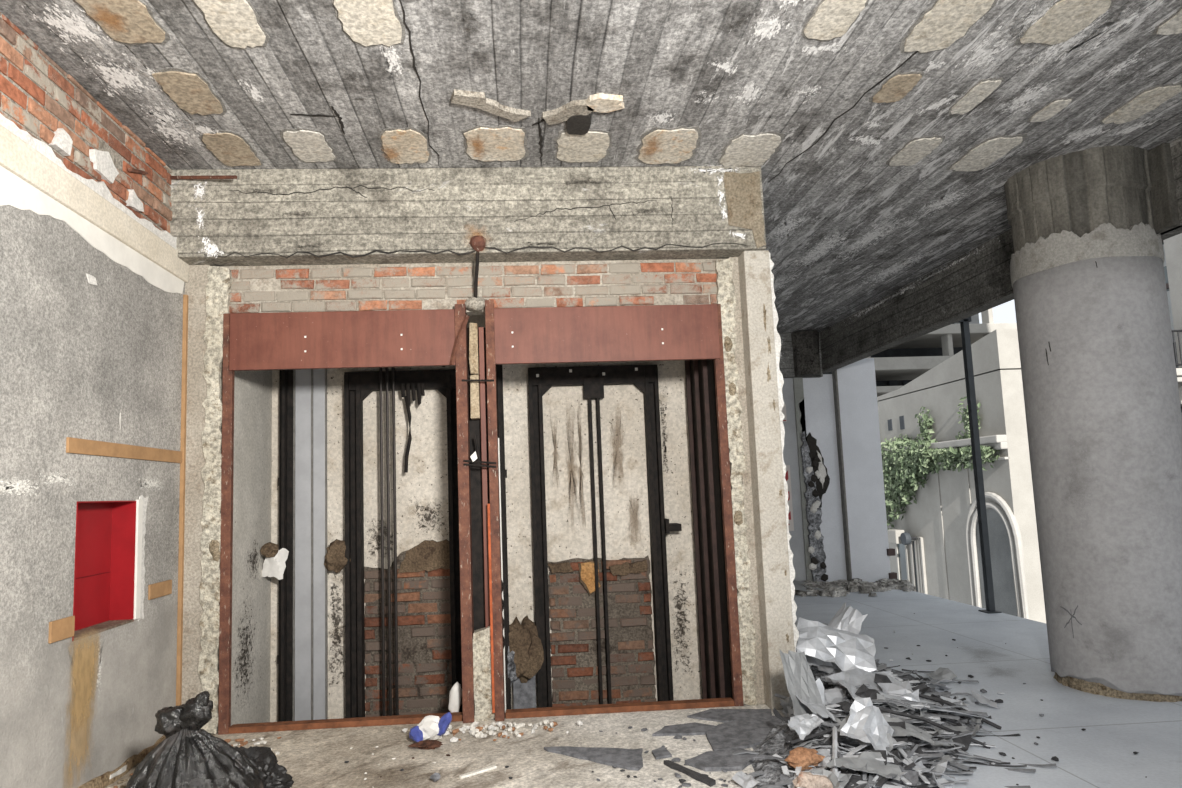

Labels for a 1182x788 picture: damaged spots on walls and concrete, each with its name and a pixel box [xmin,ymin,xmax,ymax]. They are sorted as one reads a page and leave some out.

spalling [75,0,170,45]
spalling [192,0,270,50]
spalling [332,0,405,48]
spalling [802,0,869,42]
spalling [900,0,998,53]
spalling [1014,0,1116,46]
spalling [1152,7,1182,36]
crack [229,0,439,198]
flaking render [0,12,177,249]
spalling [461,125,530,162]
spalling [634,125,702,165]
spalling [799,398,830,581]